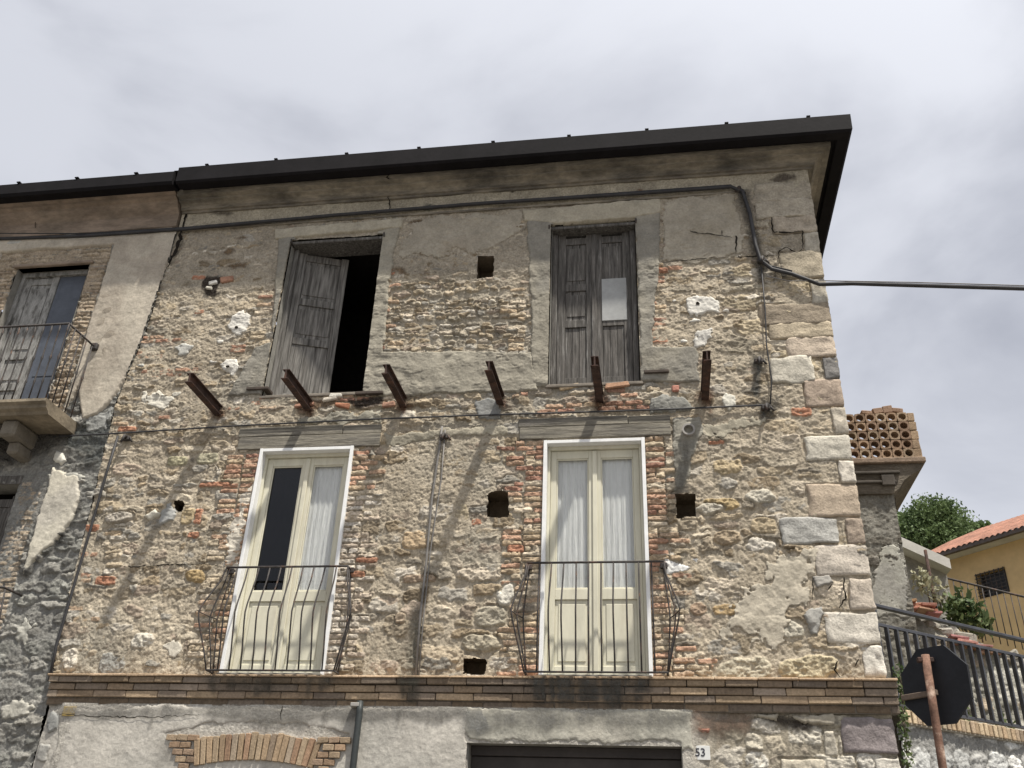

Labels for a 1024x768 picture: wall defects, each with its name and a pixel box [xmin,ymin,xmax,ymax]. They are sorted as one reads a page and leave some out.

crack [167,214,187,267]
crack [661,217,804,266]
spalling [80,407,114,432]
spalling [15,614,37,645]
spalling [0,698,35,719]